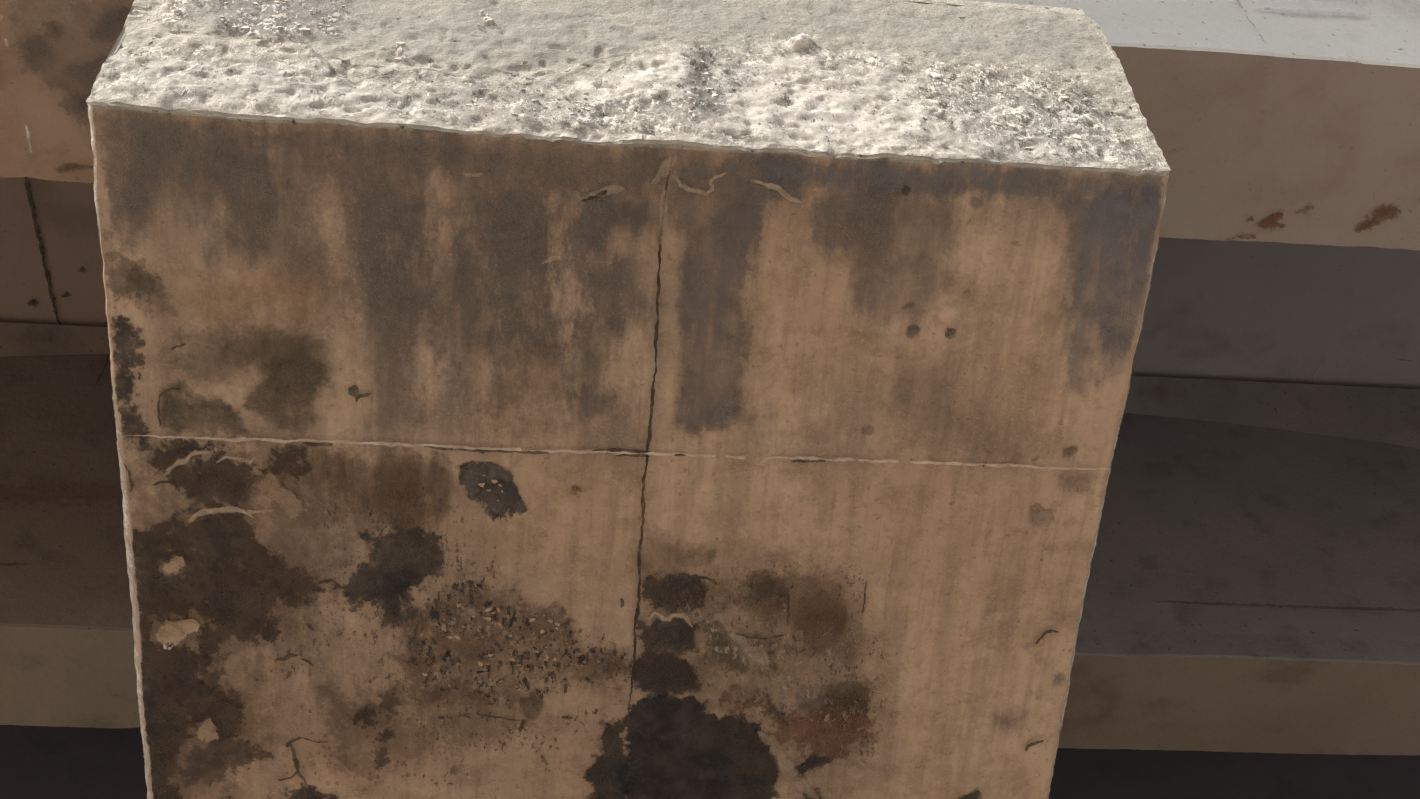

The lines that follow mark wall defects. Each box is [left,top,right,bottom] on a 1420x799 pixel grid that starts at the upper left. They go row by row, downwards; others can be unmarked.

damp [89,7,130,38]
damp [65,37,692,233]
damp [559,39,1160,434]
rust [1228,206,1313,241]
rust [1355,205,1401,233]
damp [111,316,882,799]
damp [958,790,981,799]